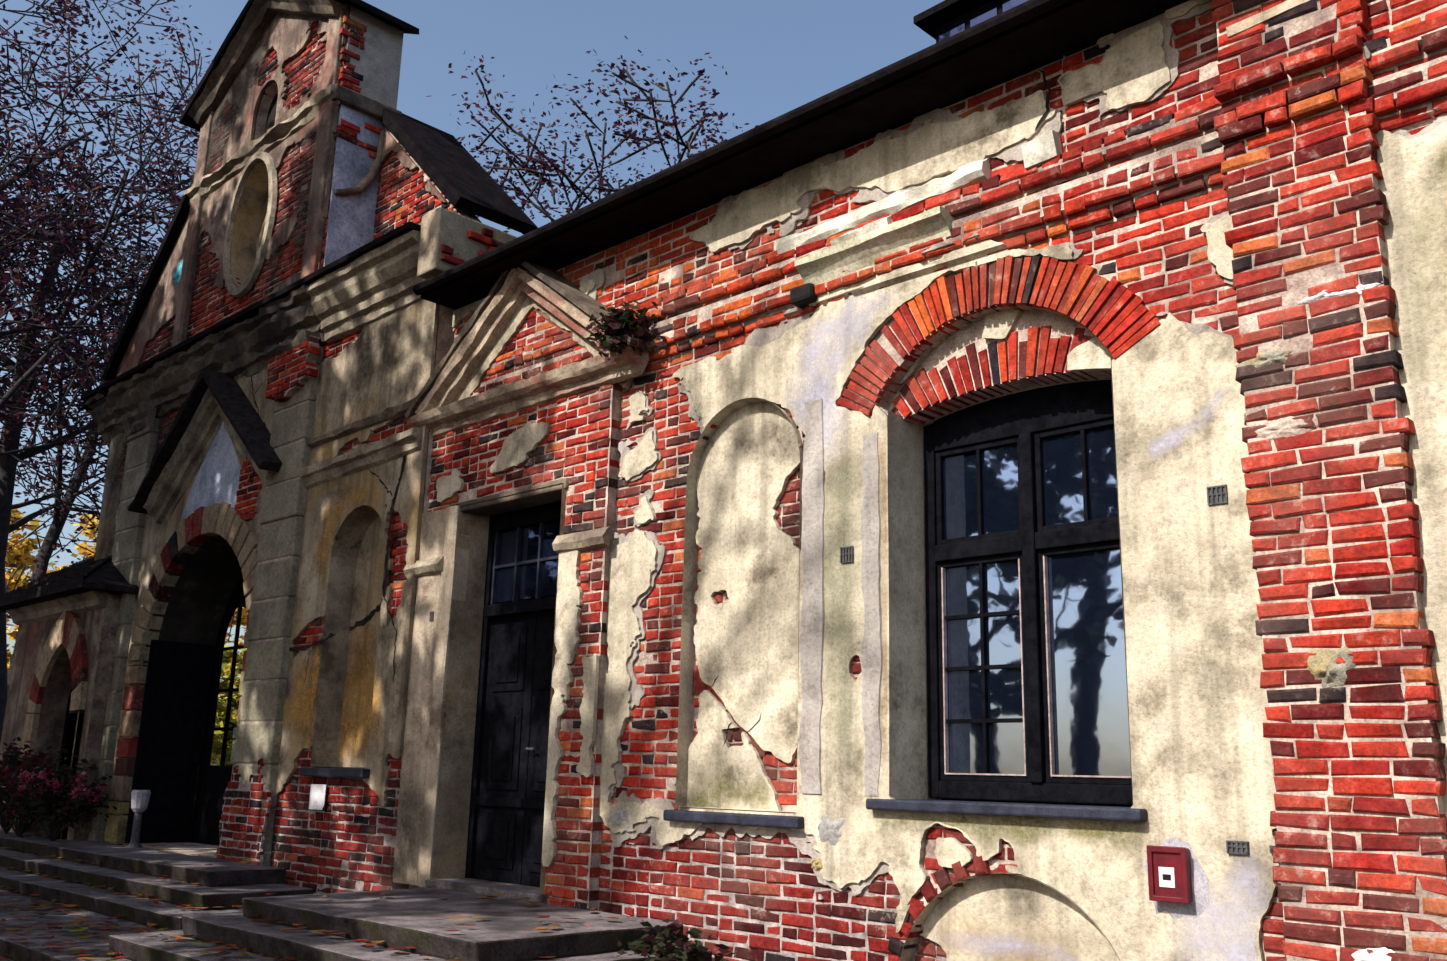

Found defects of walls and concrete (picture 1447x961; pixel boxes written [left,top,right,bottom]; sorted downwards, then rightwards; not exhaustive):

spalling [250,6,367,109]
crack [1035,70,1062,131]
spalling [331,119,504,266]
spalling [140,133,316,364]
spalling [265,329,363,403]
spalling [341,416,410,455]
spalling [427,10,1240,961]
crack [289,455,406,684]
spalling [387,511,421,620]
spalling [294,617,325,655]
crack [692,671,766,757]
spalling [211,742,404,894]